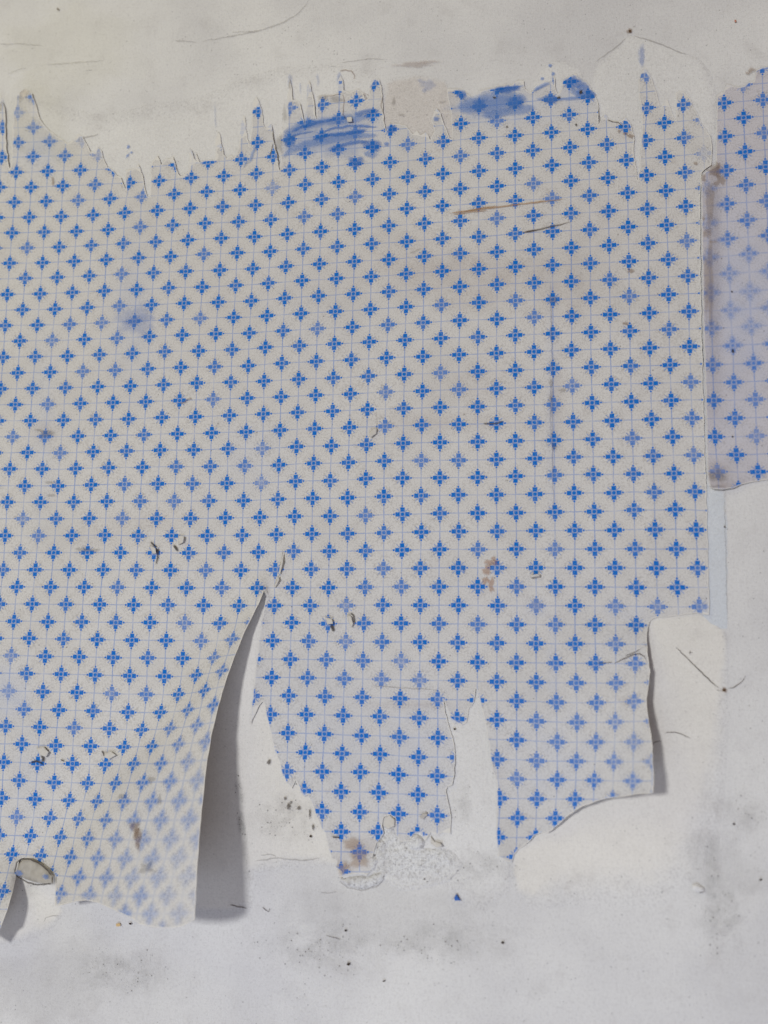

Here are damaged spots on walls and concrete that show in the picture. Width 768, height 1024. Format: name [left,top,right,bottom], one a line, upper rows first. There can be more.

peeling [33,63,384,197]
peeling [534,36,717,180]
peeling [0,552,729,948]